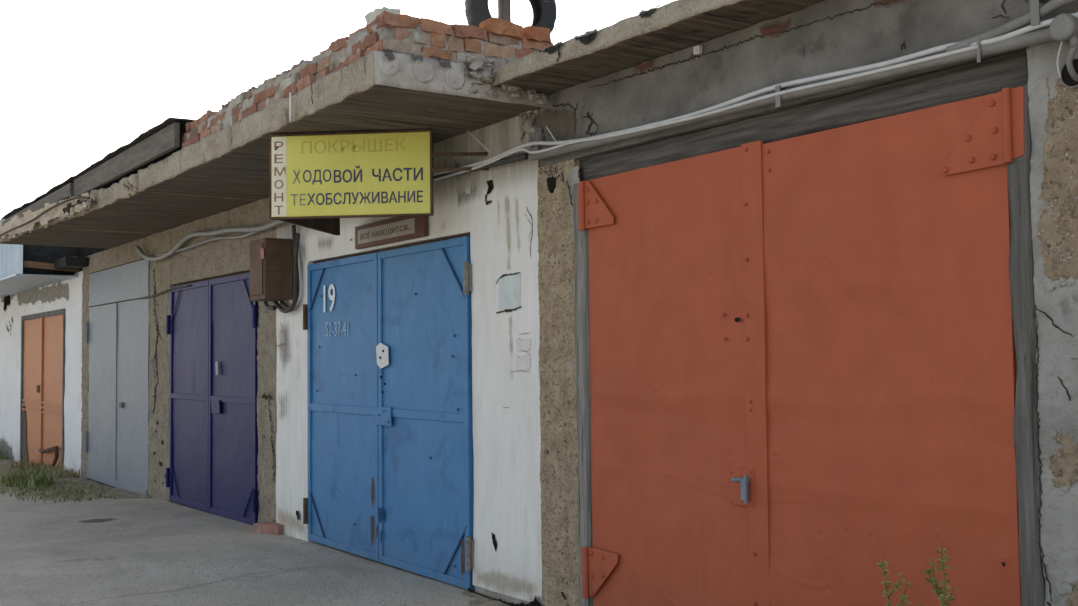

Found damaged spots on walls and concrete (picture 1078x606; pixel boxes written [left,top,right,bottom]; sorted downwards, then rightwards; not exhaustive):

crack [520,3,885,140]
spalling [0,192,95,239]
spalling [1036,77,1078,291]
crack [1035,305,1074,606]
spalling [1048,428,1078,497]